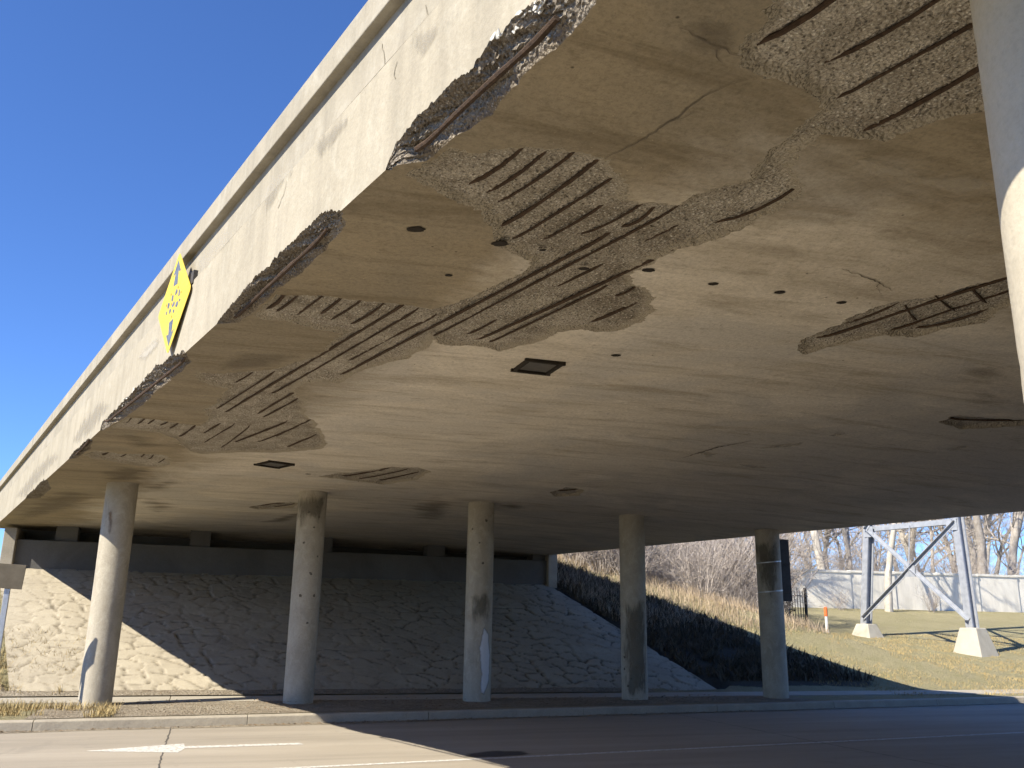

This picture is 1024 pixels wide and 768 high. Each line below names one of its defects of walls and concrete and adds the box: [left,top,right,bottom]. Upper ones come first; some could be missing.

crack [606,28,745,158]
spalling [101,0,1011,454]
spalling [320,467,431,485]
spalling [939,415,1024,430]